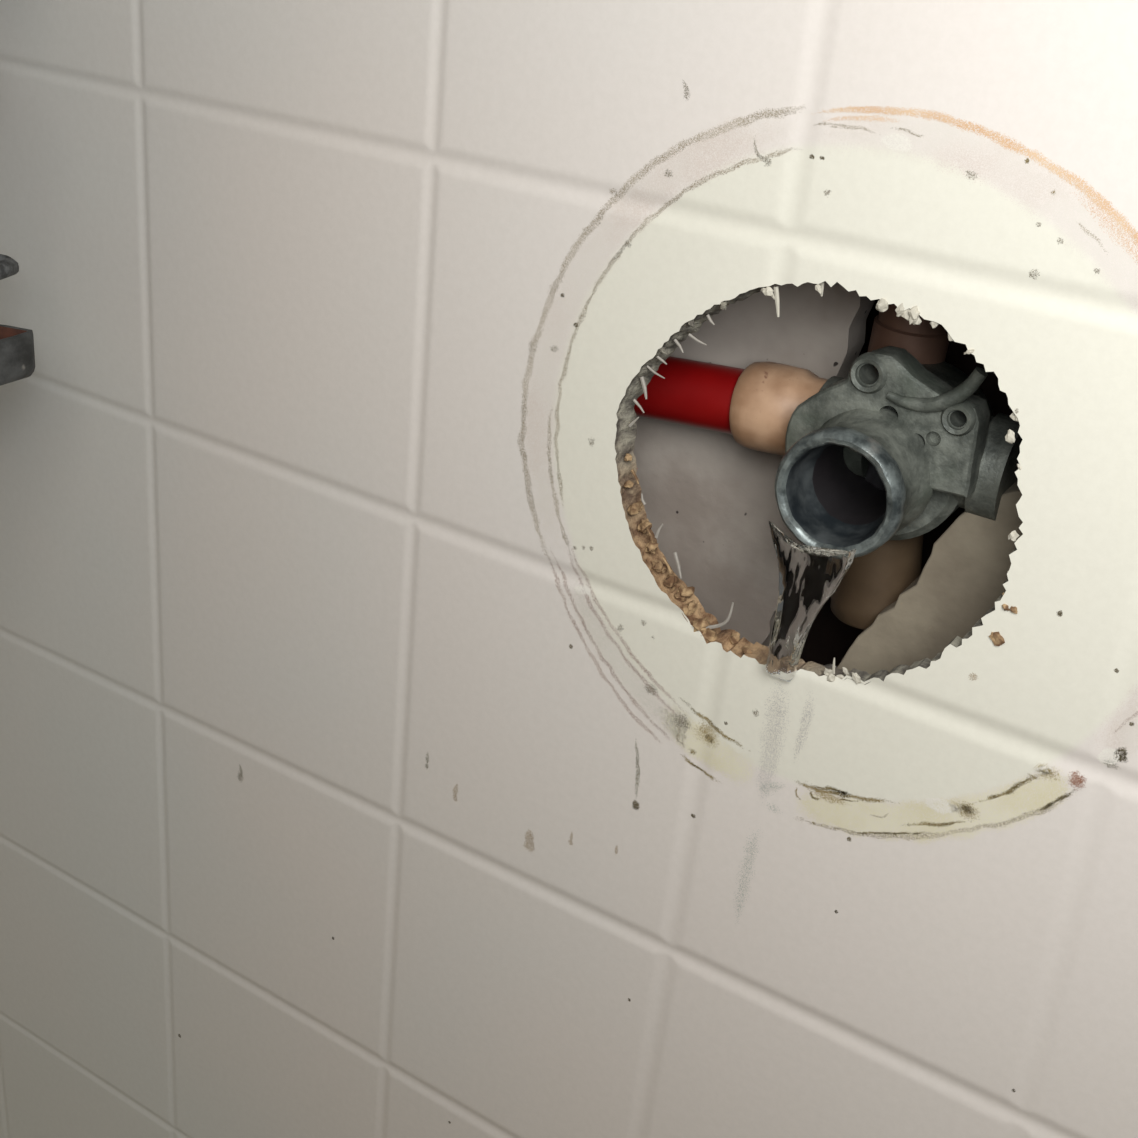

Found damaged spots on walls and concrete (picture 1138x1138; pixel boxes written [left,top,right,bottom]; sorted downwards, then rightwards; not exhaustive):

corrosion [818,106,1138,263]
spalling [858,298,1019,444]
spalling [617,284,780,658]
spalling [921,507,965,573]
spalling [800,597,868,685]
spalling [989,632,1005,646]
leakage [672,713,728,755]
leakage [1029,763,1060,781]
leakage [951,801,980,822]